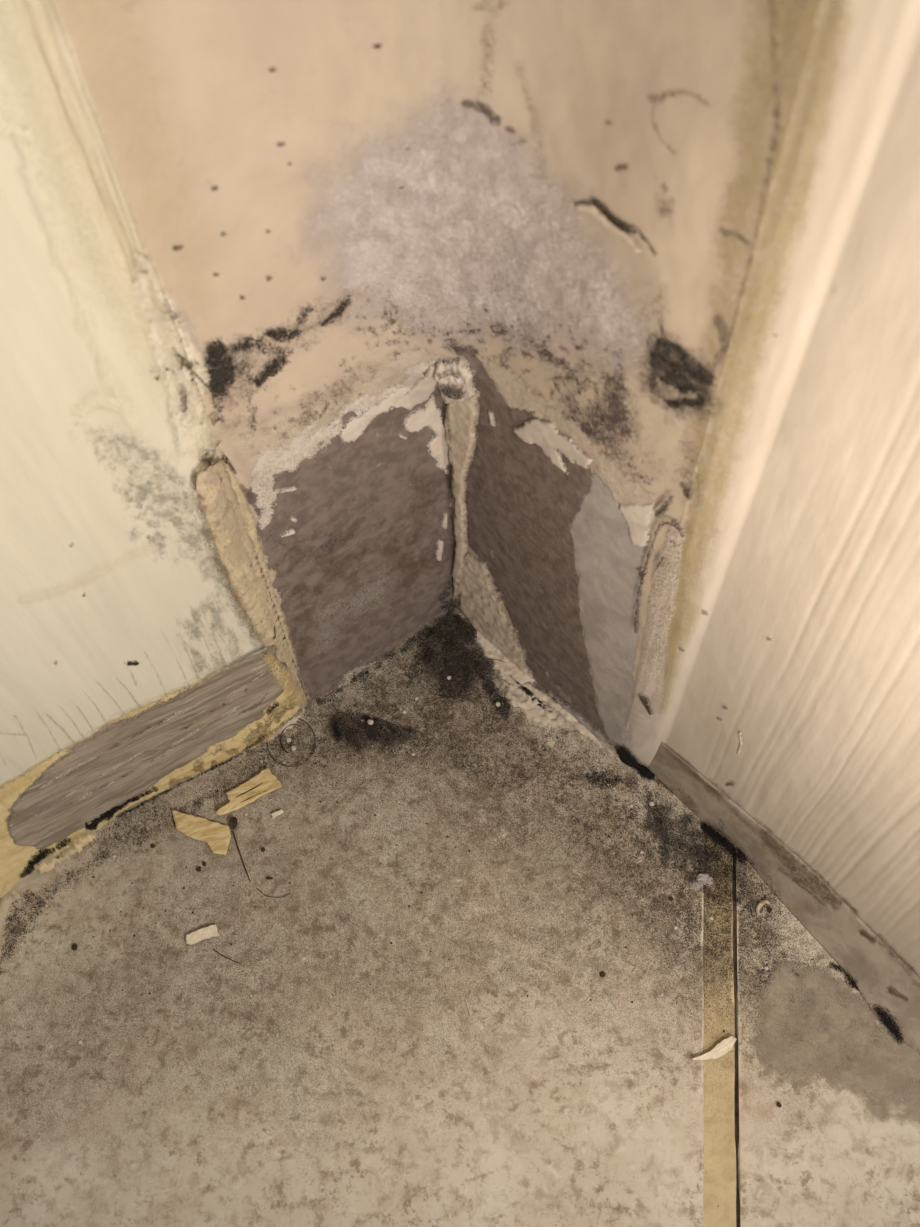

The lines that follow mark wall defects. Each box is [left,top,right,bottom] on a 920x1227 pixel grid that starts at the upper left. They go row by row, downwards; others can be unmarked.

peeling [189,336,697,764]
damp [199,0,859,702]